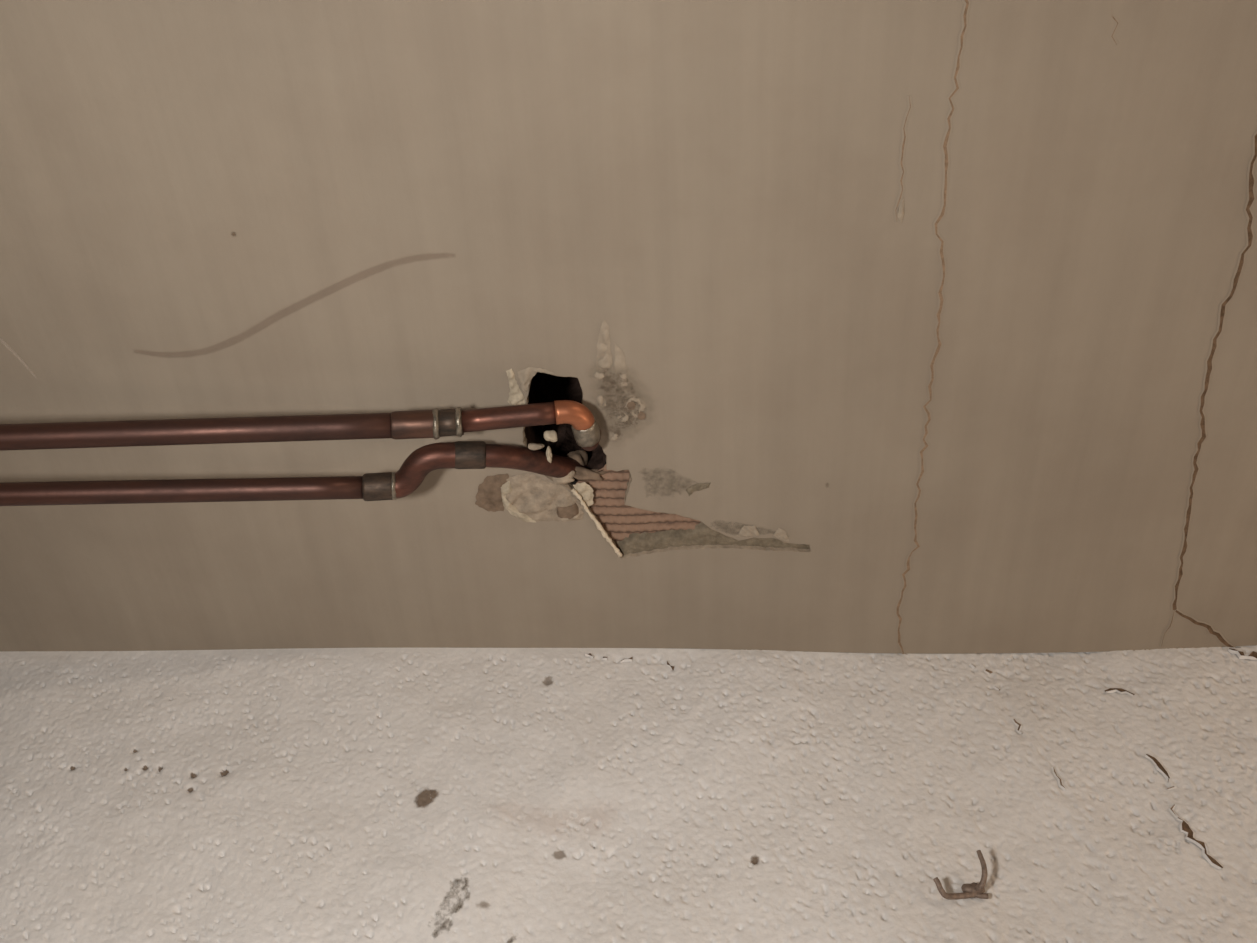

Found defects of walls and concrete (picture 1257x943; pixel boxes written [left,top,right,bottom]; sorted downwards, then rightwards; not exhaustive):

flaking render [506,319,811,559]
crack [893,0,971,655]
crack [1160,131,1257,660]